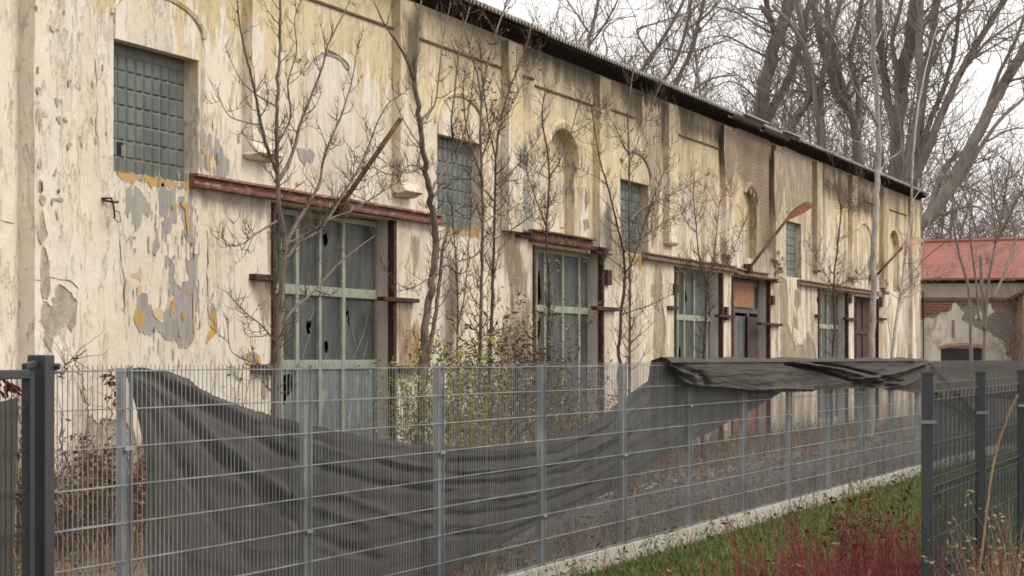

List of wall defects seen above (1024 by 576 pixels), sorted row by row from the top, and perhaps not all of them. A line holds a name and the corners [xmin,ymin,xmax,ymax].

spalling [35,98,68,132]
spalling [37,158,77,352]
peeling [116,109,229,367]
flaking render [921,301,1006,320]